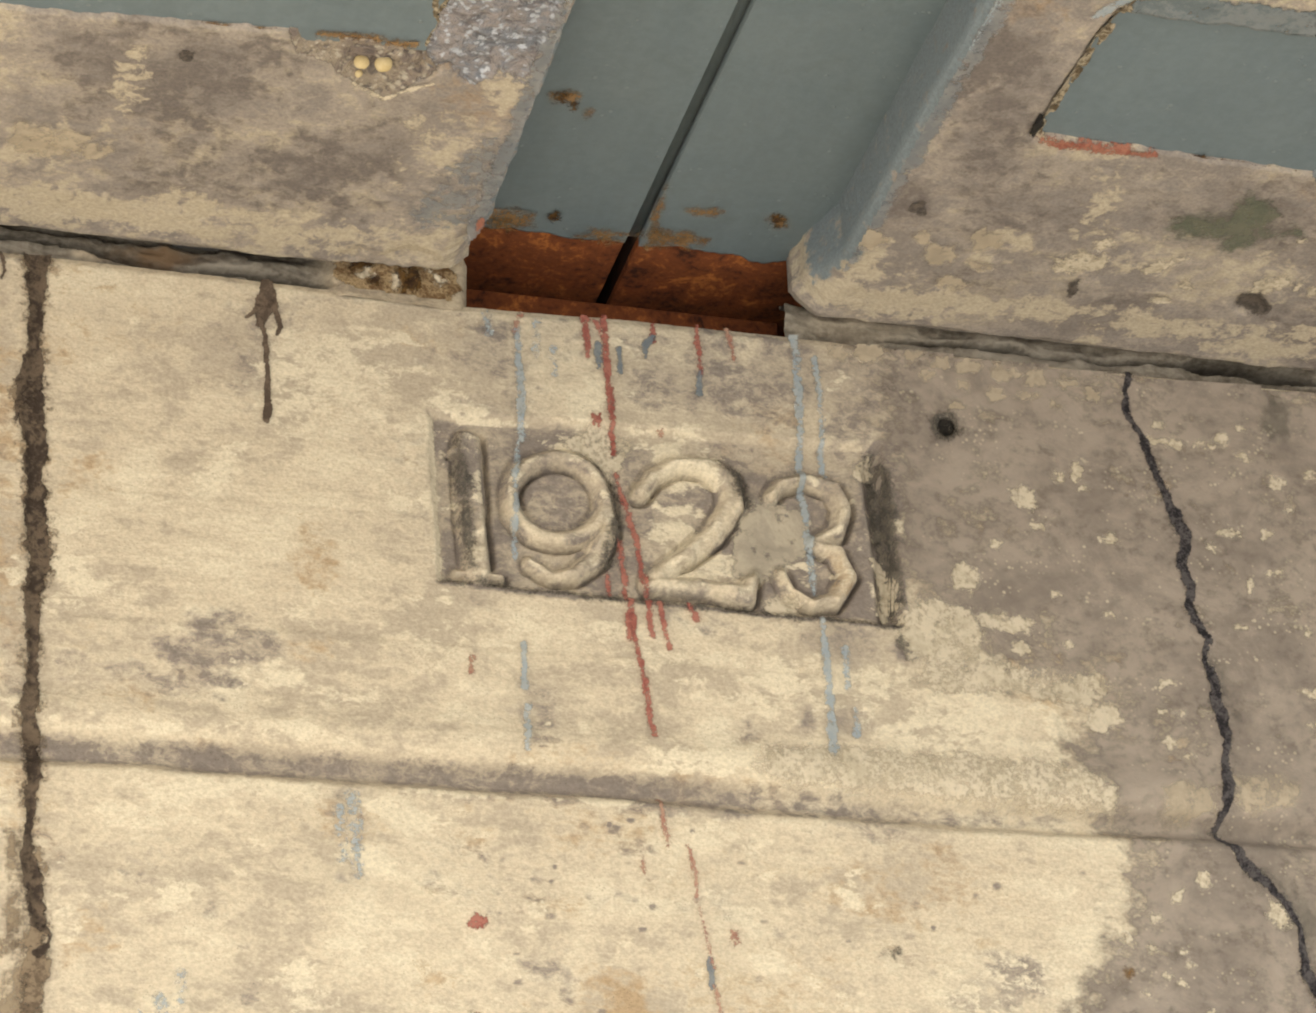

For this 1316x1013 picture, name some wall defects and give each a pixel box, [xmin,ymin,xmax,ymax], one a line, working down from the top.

spalling [289,0,566,101]
spalling [333,261,463,301]
corrosion [485,206,562,231]
corrosion [574,185,711,304]
leakage [1167,197,1302,253]
leakage [245,279,283,424]
crack [7,252,57,1013]
leakage [870,349,1316,1013]
crack [1121,371,1316,998]